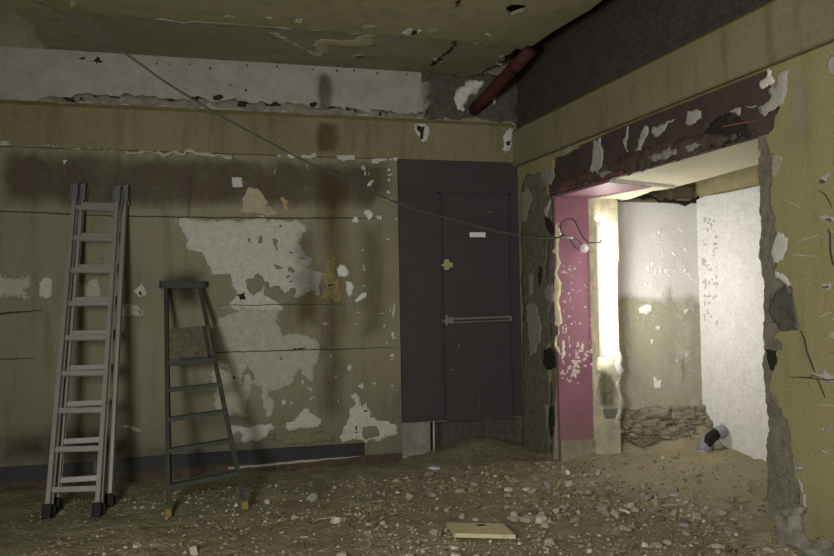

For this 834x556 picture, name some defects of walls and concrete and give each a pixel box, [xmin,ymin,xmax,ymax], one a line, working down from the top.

spalling [38,72,518,157]
peeling [685,109,701,126]
peeling [759,68,775,89]
peeling [174,177,398,447]
spalling [520,119,765,453]
peeling [771,232,791,287]
crack [791,331,834,398]
spalling [771,462,834,556]